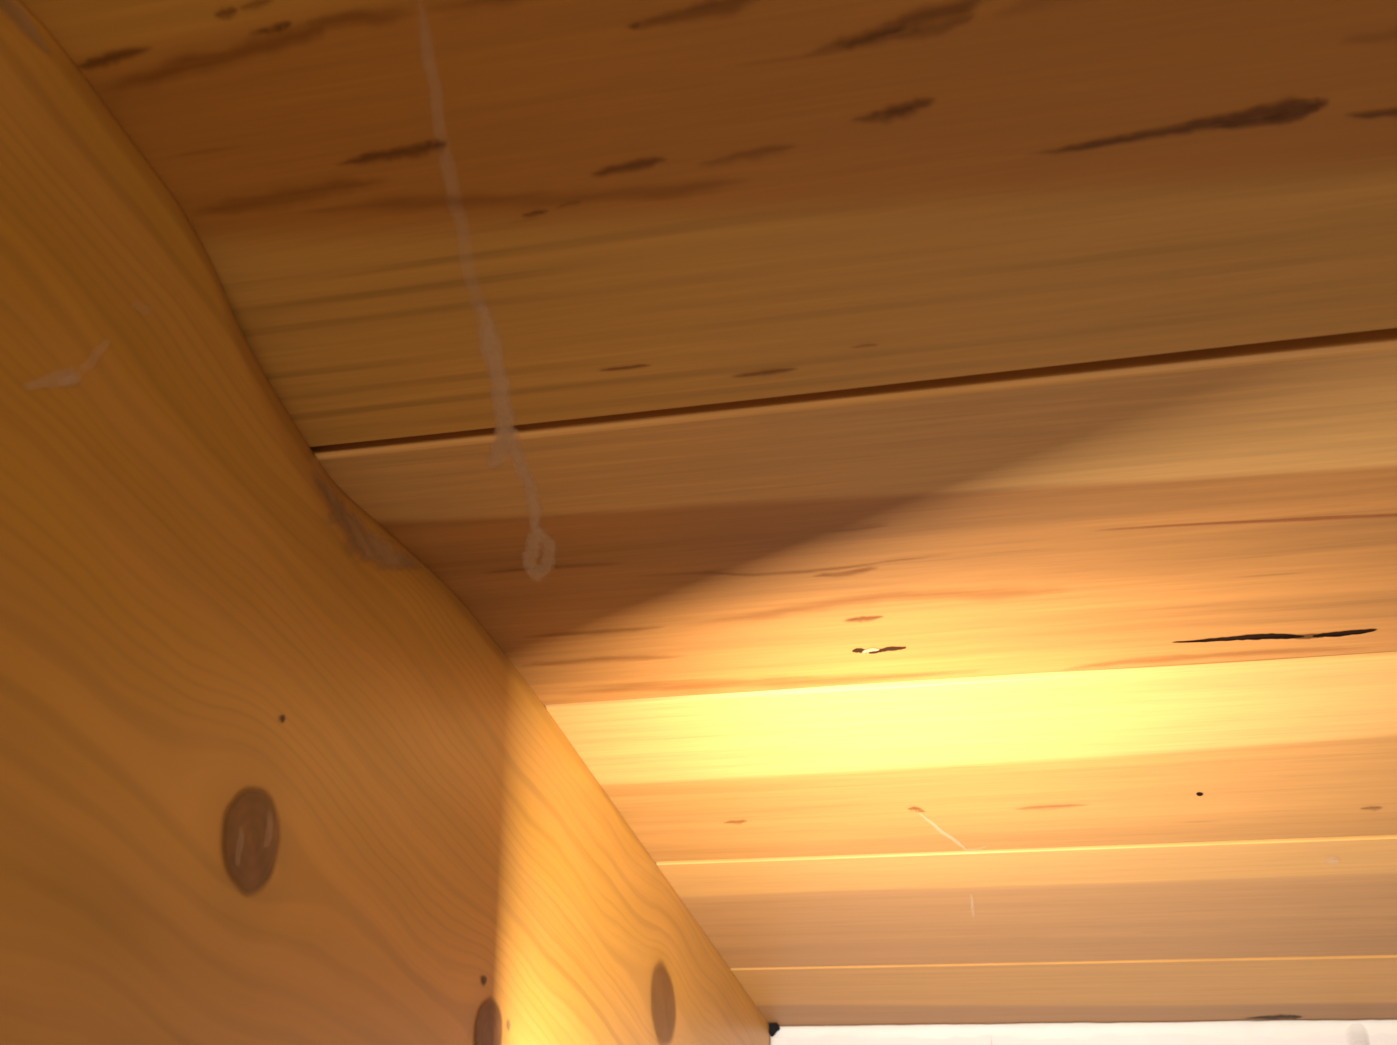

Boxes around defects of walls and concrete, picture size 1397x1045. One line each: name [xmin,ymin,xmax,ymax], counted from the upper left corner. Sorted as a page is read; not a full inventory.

crack [1172,629,1376,643]
crack [852,646,906,654]